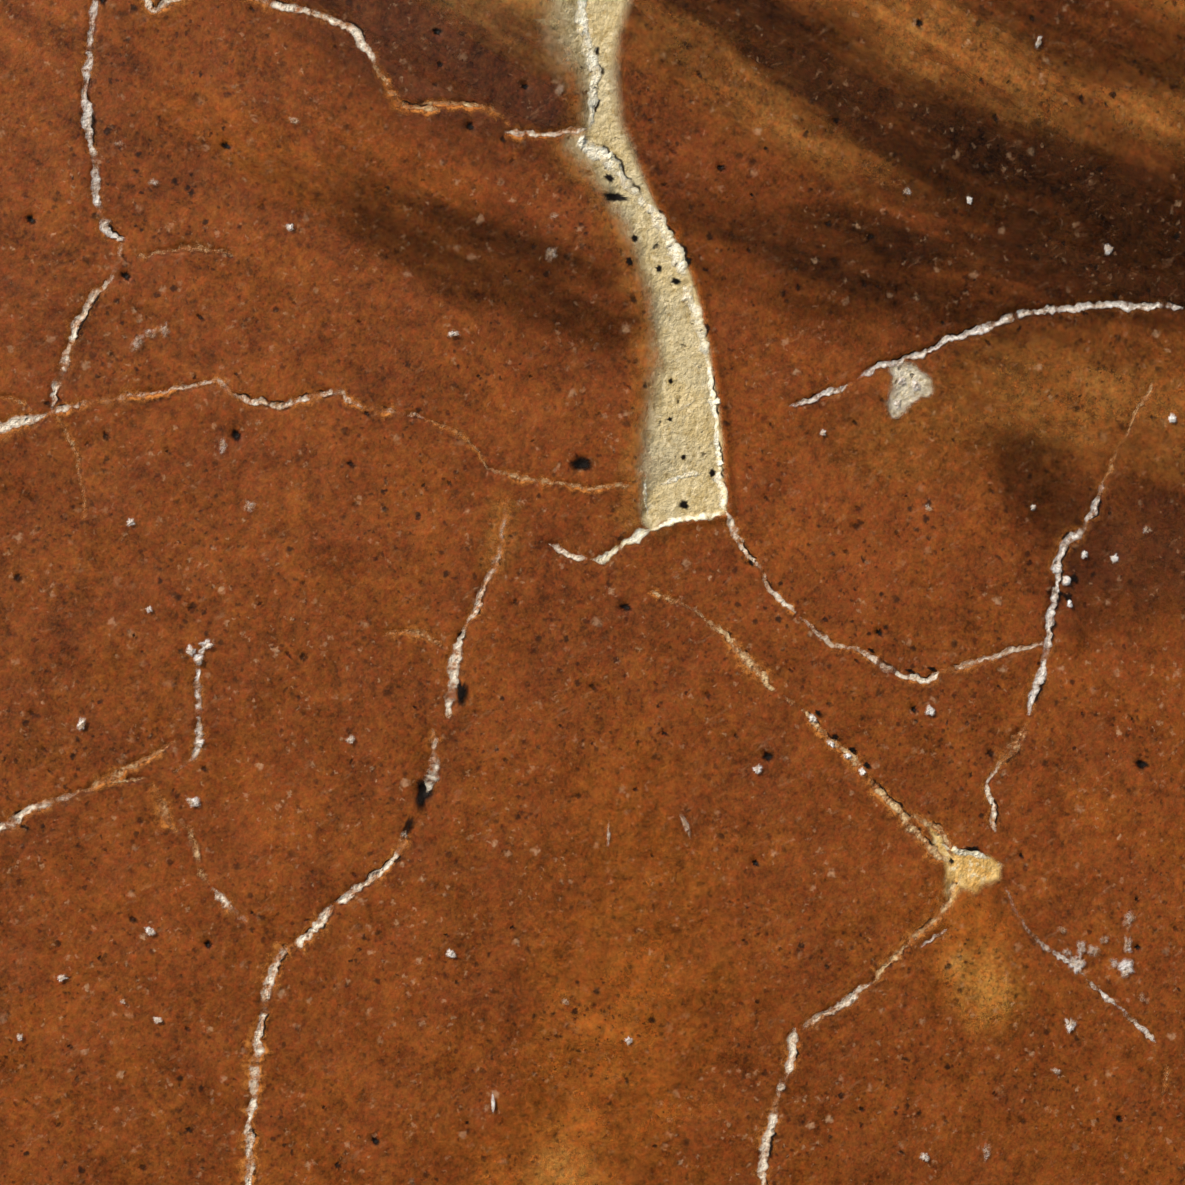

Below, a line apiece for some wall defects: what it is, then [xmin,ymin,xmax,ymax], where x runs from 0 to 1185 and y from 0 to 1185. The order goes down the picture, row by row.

crack [82,0,223,258]
crack [251,0,586,141]
spalling [550,0,727,530]
spalling [889,364,931,416]
crack [794,301,1180,406]
crack [553,529,648,564]
crack [648,589,678,603]
crack [707,621,775,690]
crack [723,386,1152,828]
crack [0,280,622,1185]
spalling [930,828,1001,898]
crack [756,709,956,1185]